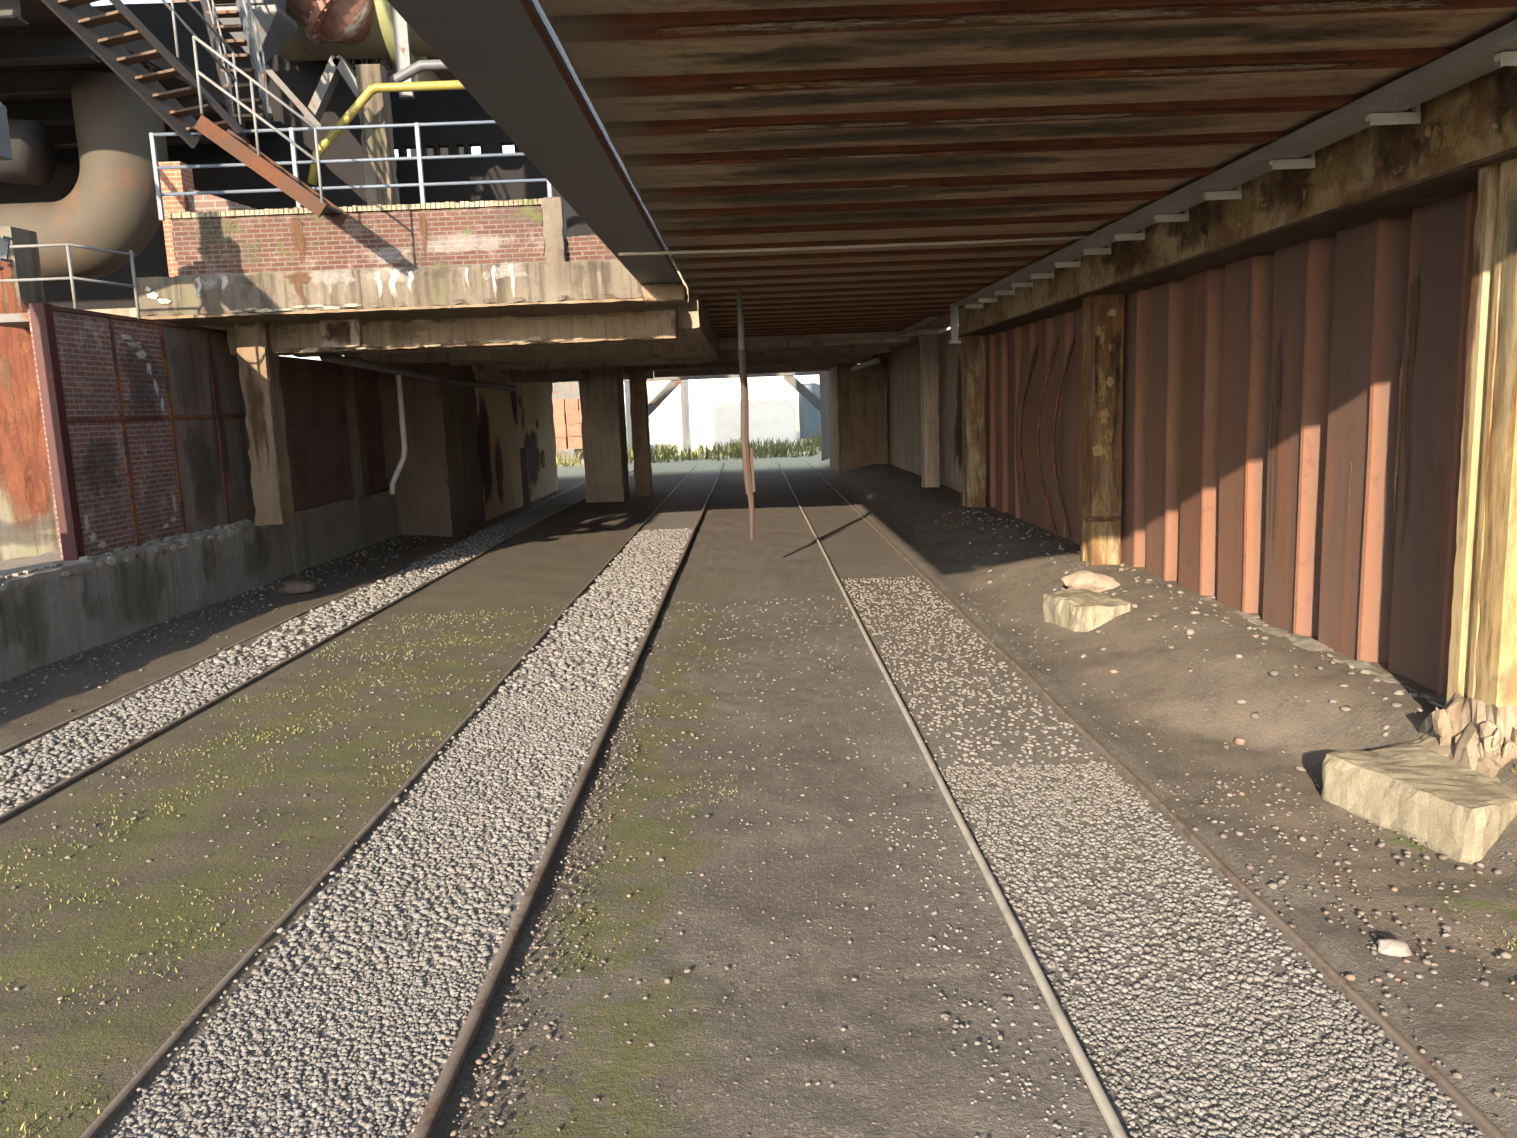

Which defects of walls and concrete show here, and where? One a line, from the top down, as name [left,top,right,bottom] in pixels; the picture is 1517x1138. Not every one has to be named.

rust [652,0,1482,35]
rust [684,62,1369,92]
rust [520,0,676,273]
rust [685,142,1222,164]
spalling [145,286,172,304]
rust [0,256,52,524]
damp [478,398,503,508]